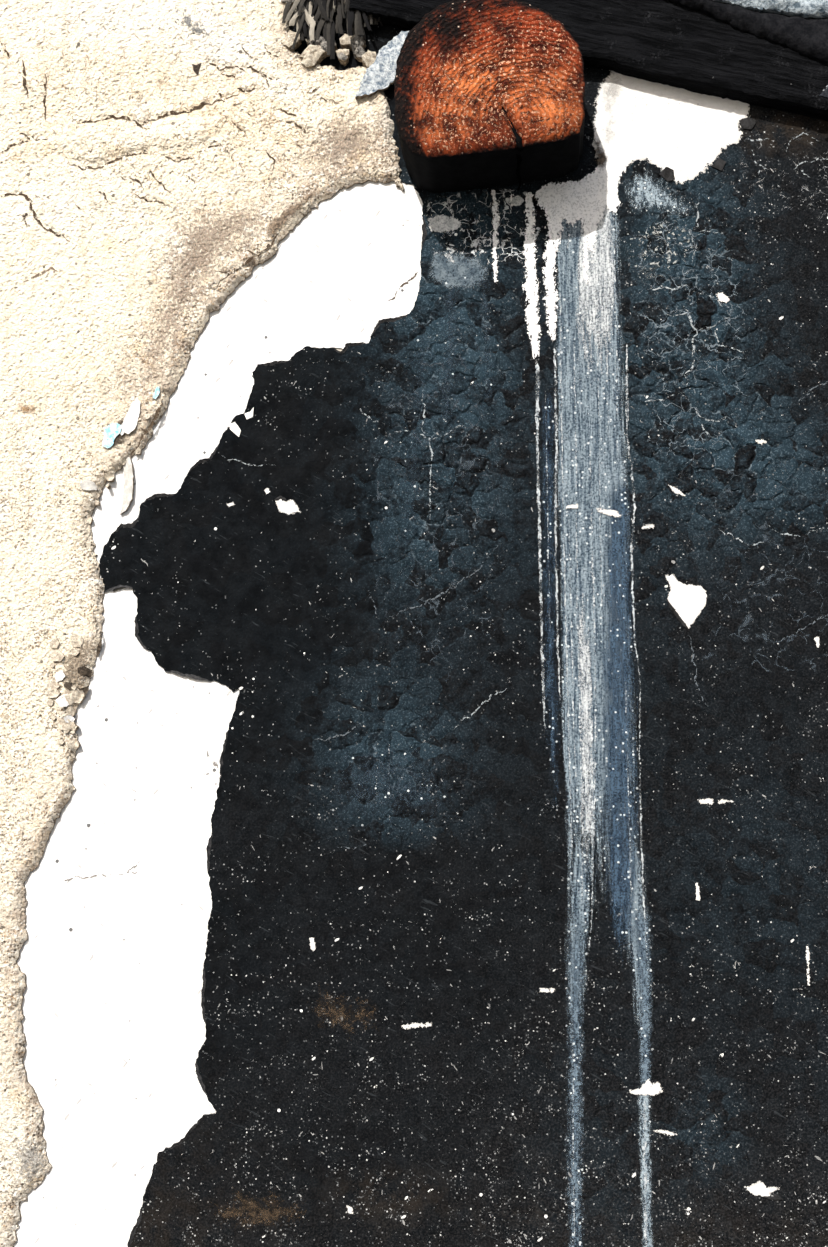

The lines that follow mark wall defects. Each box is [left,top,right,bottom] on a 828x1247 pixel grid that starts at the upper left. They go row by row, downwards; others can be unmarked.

crack [1,43,343,209]
crack [0,193,70,291]
crack [214,231,280,290]
peeling [506,196,524,206]
peeling [666,574,707,631]
peeling [13,181,461,1247]
water stain [431,142,685,1247]